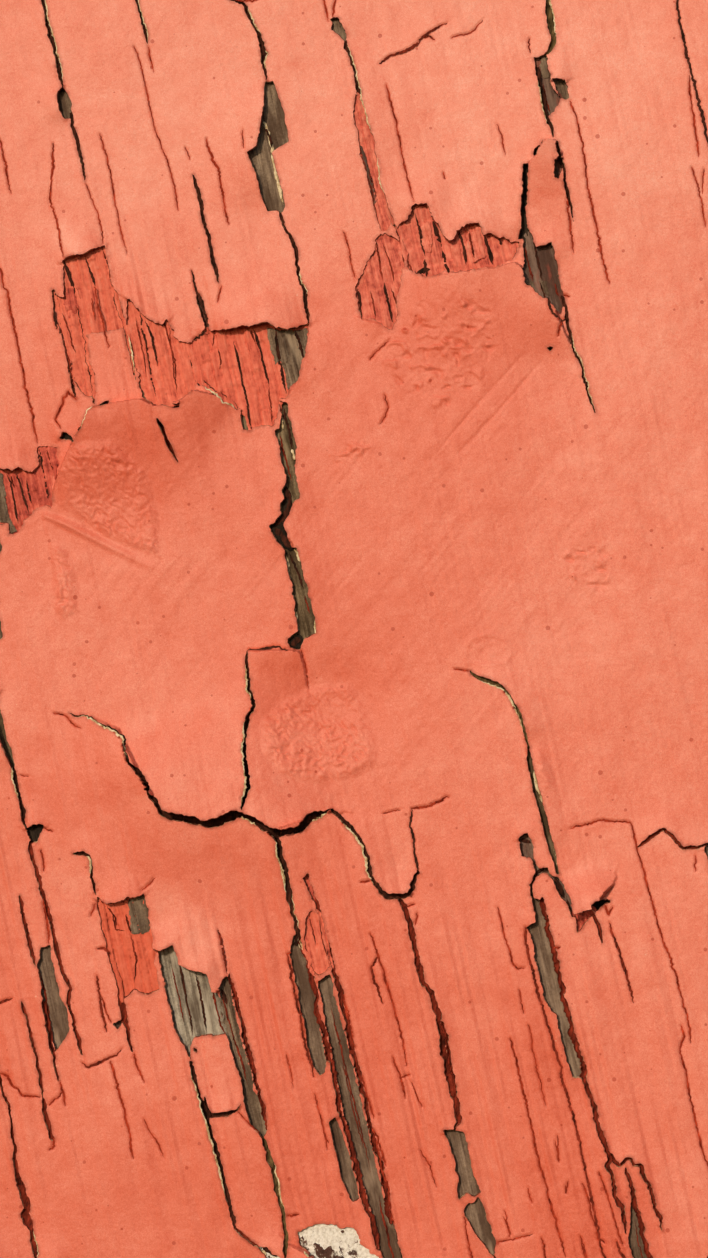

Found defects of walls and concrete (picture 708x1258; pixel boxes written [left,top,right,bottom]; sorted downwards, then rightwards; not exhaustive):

peeling [248,82,288,213]
spalling [354,92,569,330]
spalling [0,433,73,551]
spalling [52,219,316,649]
peeling [0,710,15,776]
crack [455,668,529,749]
crack [0,768,163,1258]
peeling [98,881,267,1136]
crack [54,646,462,1258]
peeling [290,874,402,1258]
peeling [444,1130,496,1255]
peeling [519,749,614,1077]